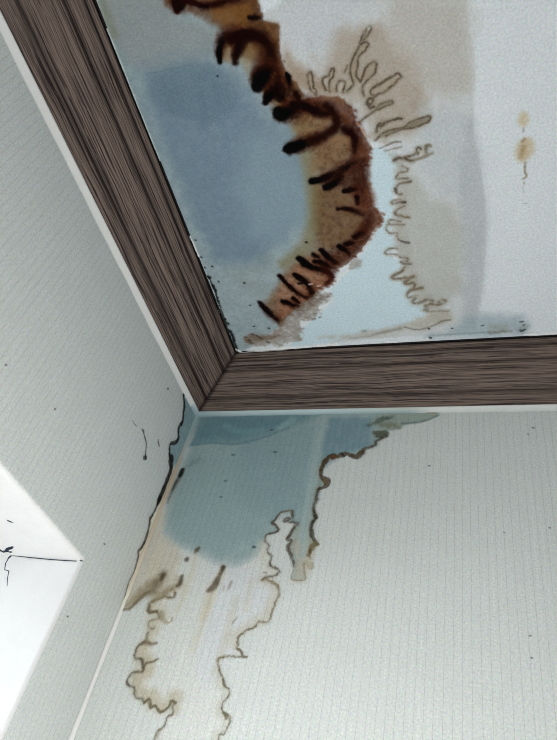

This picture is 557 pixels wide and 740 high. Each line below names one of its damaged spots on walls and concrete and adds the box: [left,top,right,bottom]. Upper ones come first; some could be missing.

water stain [96,0,335,351]
water stain [261,0,539,344]
crack [132,419,160,461]
water stain [123,393,441,740]